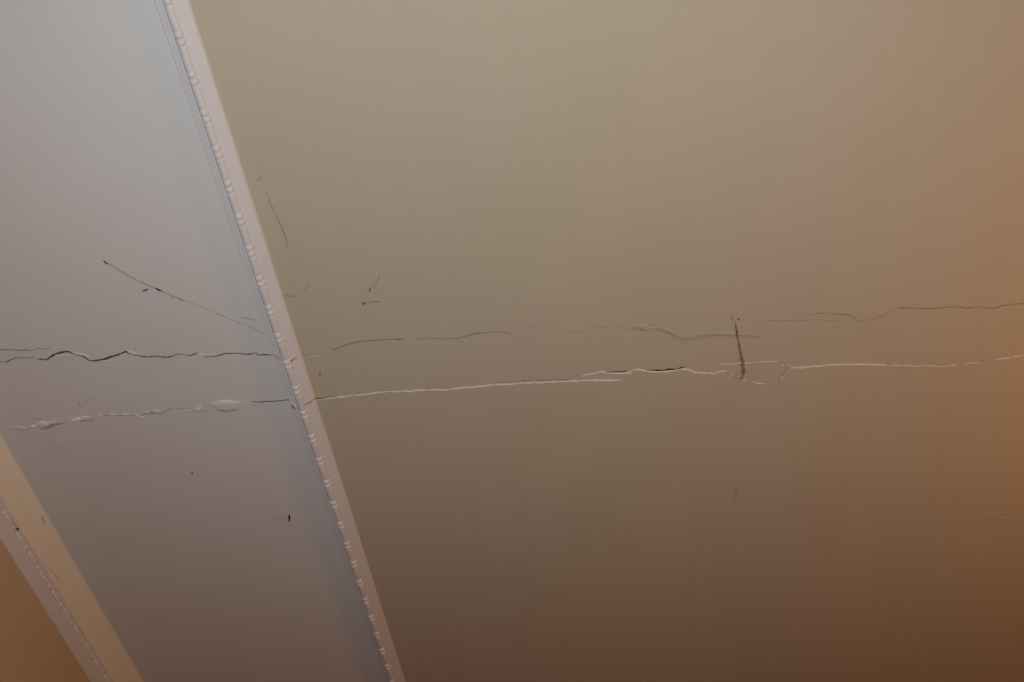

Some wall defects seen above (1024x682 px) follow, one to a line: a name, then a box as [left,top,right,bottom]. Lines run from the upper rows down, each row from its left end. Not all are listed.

crack [1,349,295,364]
crack [260,355,1024,409]